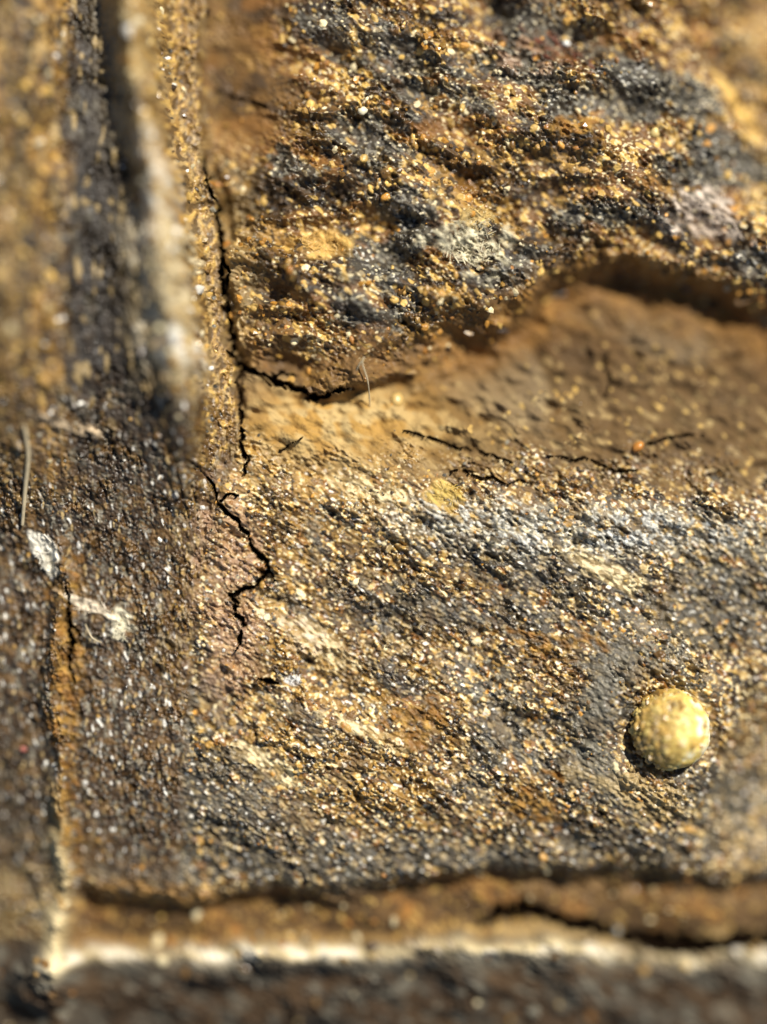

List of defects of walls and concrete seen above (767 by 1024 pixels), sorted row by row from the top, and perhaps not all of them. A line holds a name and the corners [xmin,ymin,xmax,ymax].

crack [203,158,354,651]